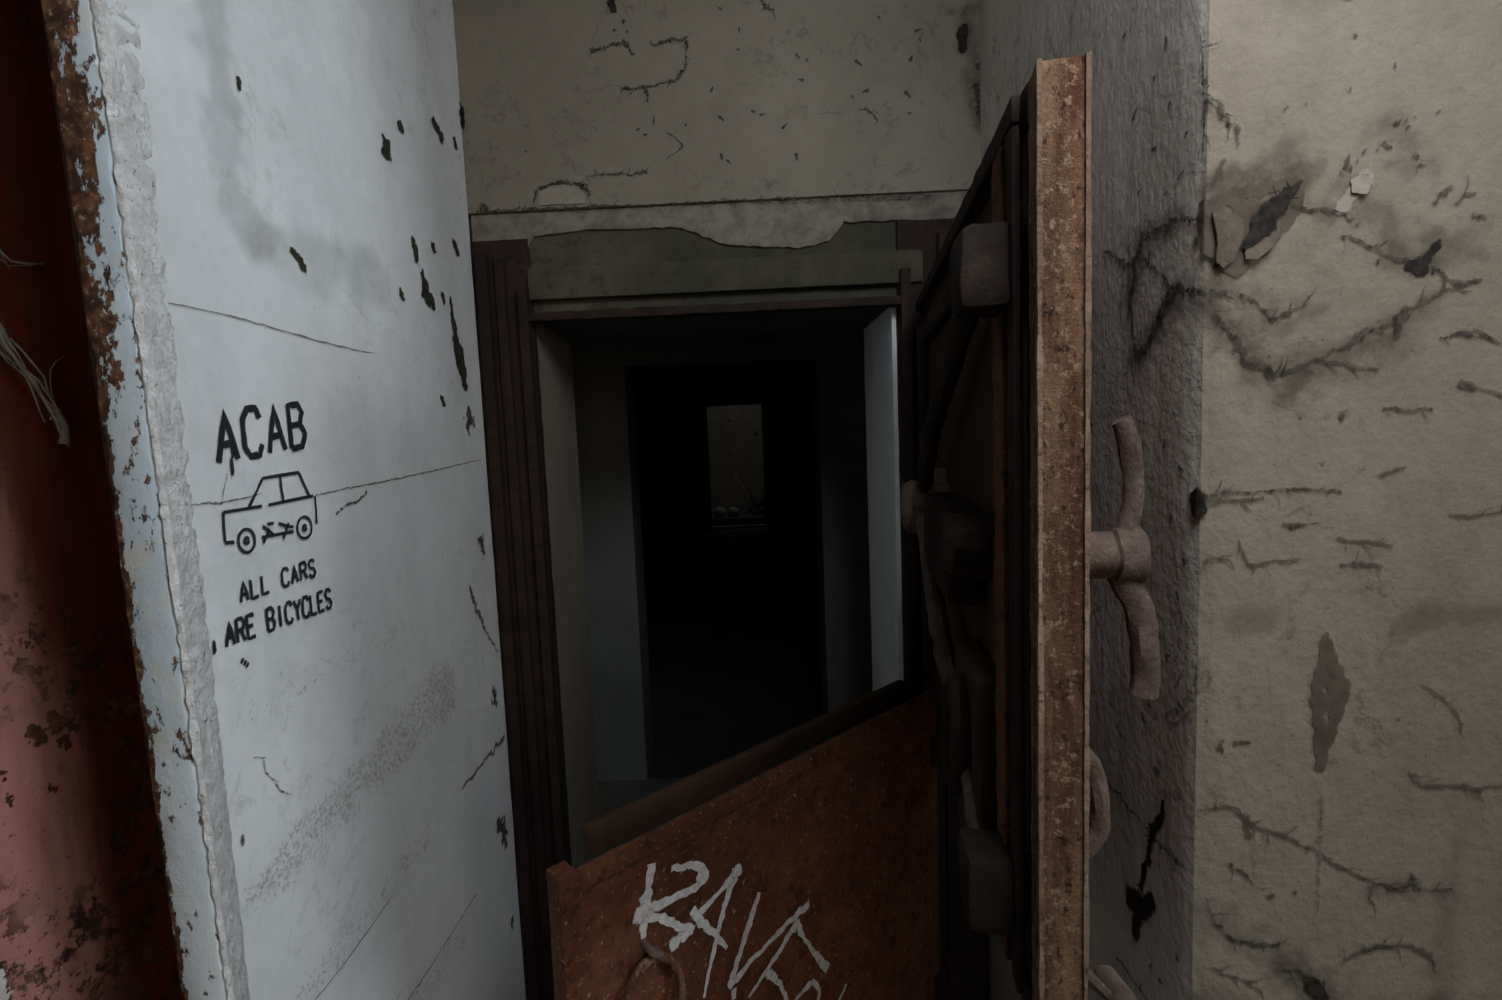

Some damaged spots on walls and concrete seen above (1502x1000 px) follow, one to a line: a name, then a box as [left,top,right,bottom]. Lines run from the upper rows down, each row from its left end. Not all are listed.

crack [1103,33,1483,380]
flaking render [1193,141,1393,278]
flaking render [399,166,967,436]
crack [1382,330,1502,419]
crack [1379,466,1407,478]
crack [1188,480,1393,582]
corrosion [24,710,82,751]
leakage [1309,631,1352,772]
corrosion [0,771,15,807]
flaking render [497,816,508,850]
crack [1107,702,1453,1000]